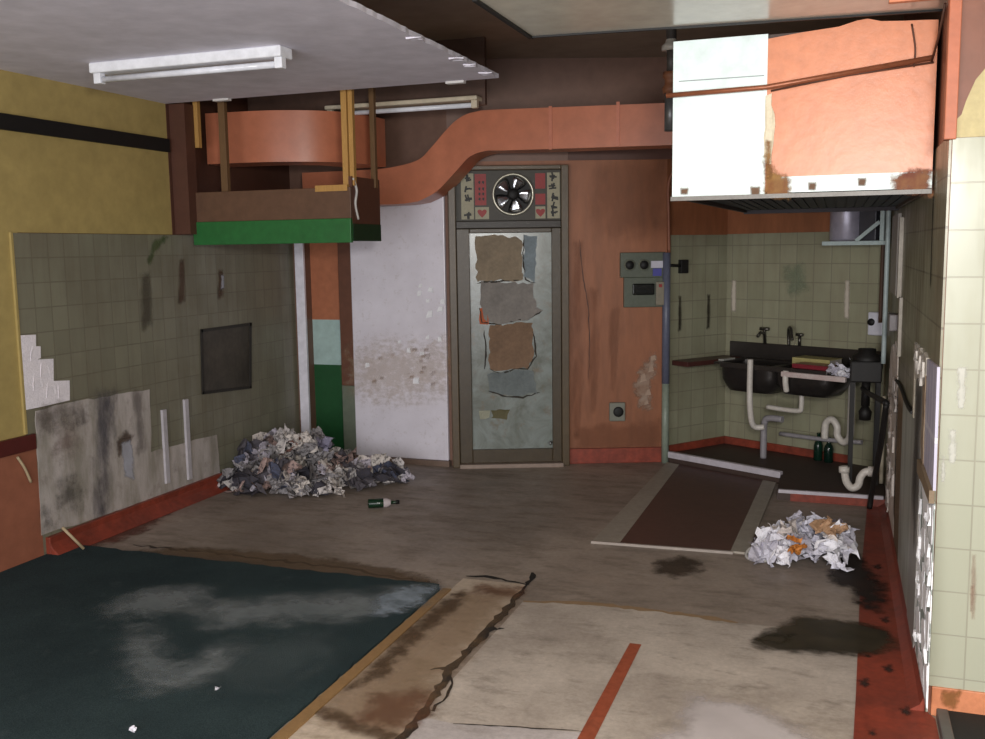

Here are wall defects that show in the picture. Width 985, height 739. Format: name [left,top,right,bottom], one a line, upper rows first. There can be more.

rust [751,141,791,194]
rust [891,169,933,197]
flaking render [21,335,220,536]
peeling [633,355,656,409]
flaking render [885,341,898,537]
crack [395,572,738,739]
water stain [653,557,703,576]
peeling [913,484,935,712]